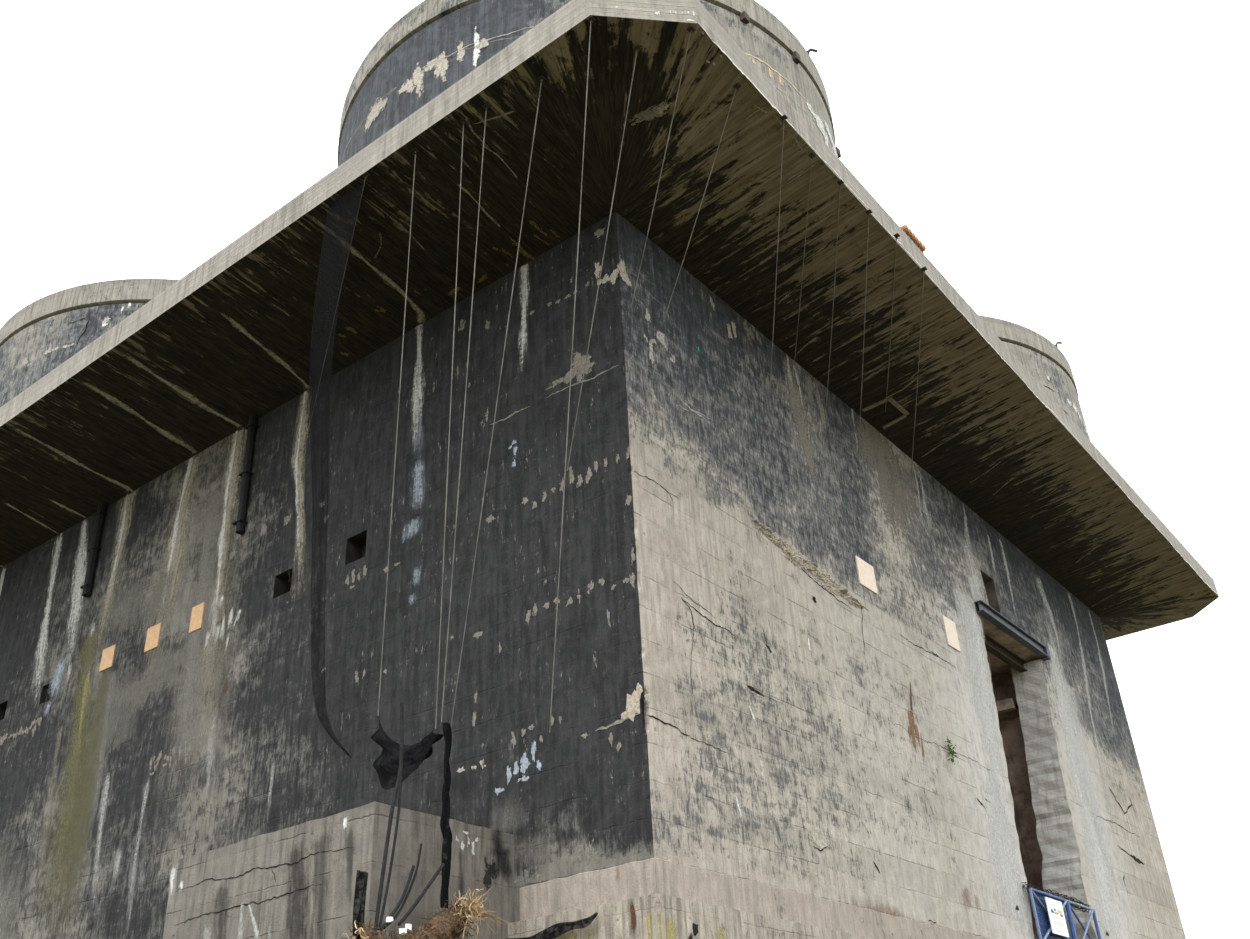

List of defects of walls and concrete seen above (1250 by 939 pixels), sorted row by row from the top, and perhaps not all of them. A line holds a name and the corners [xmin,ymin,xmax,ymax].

peeling [365,26,489,132]
peeling [529,260,632,315]
leakage [221,314,310,589]
leakage [84,354,247,813]
spalling [754,520,864,610]
leakage [4,429,136,922]
spalling [581,683,650,751]
crack [648,715,729,754]
crack [677,584,772,694]
corrosion [908,683,924,760]
leakage [954,565,1023,929]
crack [177,847,353,925]